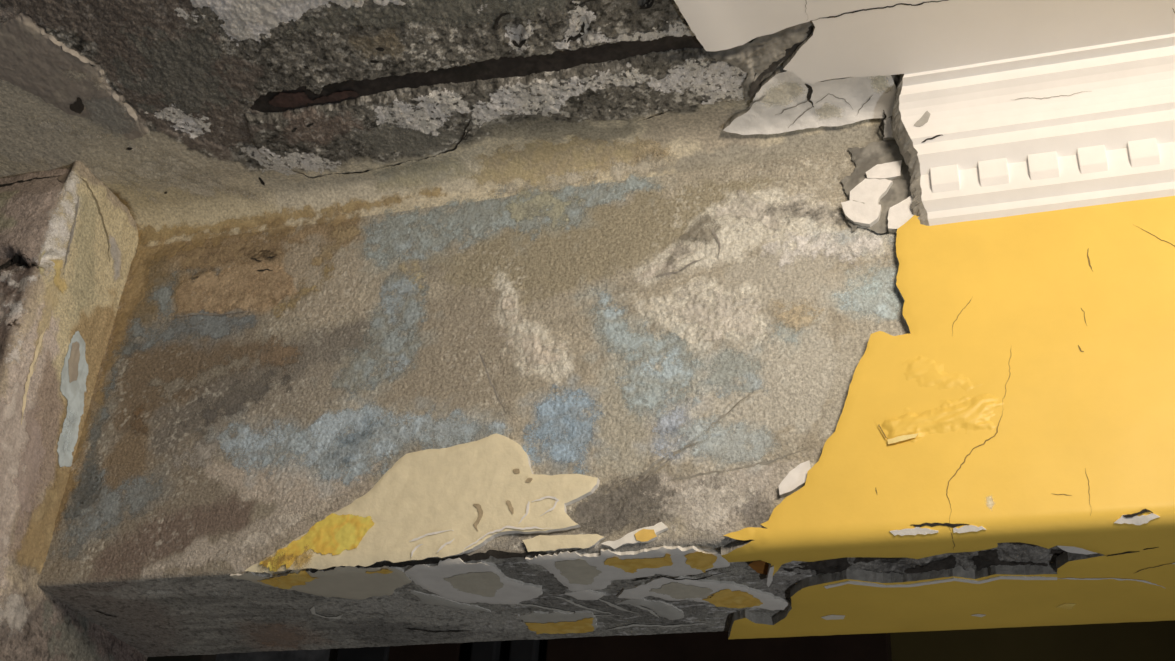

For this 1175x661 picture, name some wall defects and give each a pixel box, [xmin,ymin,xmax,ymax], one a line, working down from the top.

crack [805,0,948,21]
spalling [0,0,914,234]
crack [723,68,897,135]
peeling [914,111,930,127]
crack [0,173,69,187]
crack [0,253,51,292]
flaking render [37,149,1096,657]
crack [946,350,1011,548]
flaking render [824,576,1164,589]